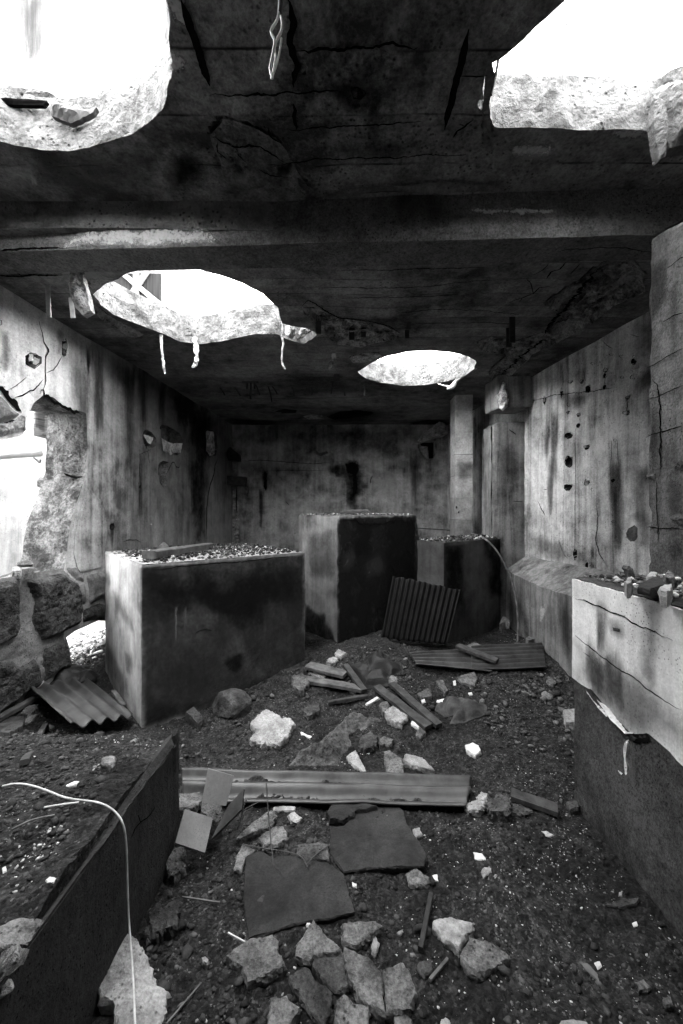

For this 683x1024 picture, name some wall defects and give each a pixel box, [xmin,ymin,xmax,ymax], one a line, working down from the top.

crack [209,0,473,178]
spalling [482,61,495,153]
spalling [92,300,143,339]
spalling [475,260,646,381]
crack [0,322,82,423]
damp [330,462,359,476]
crack [532,349,683,540]
crack [578,599,667,638]